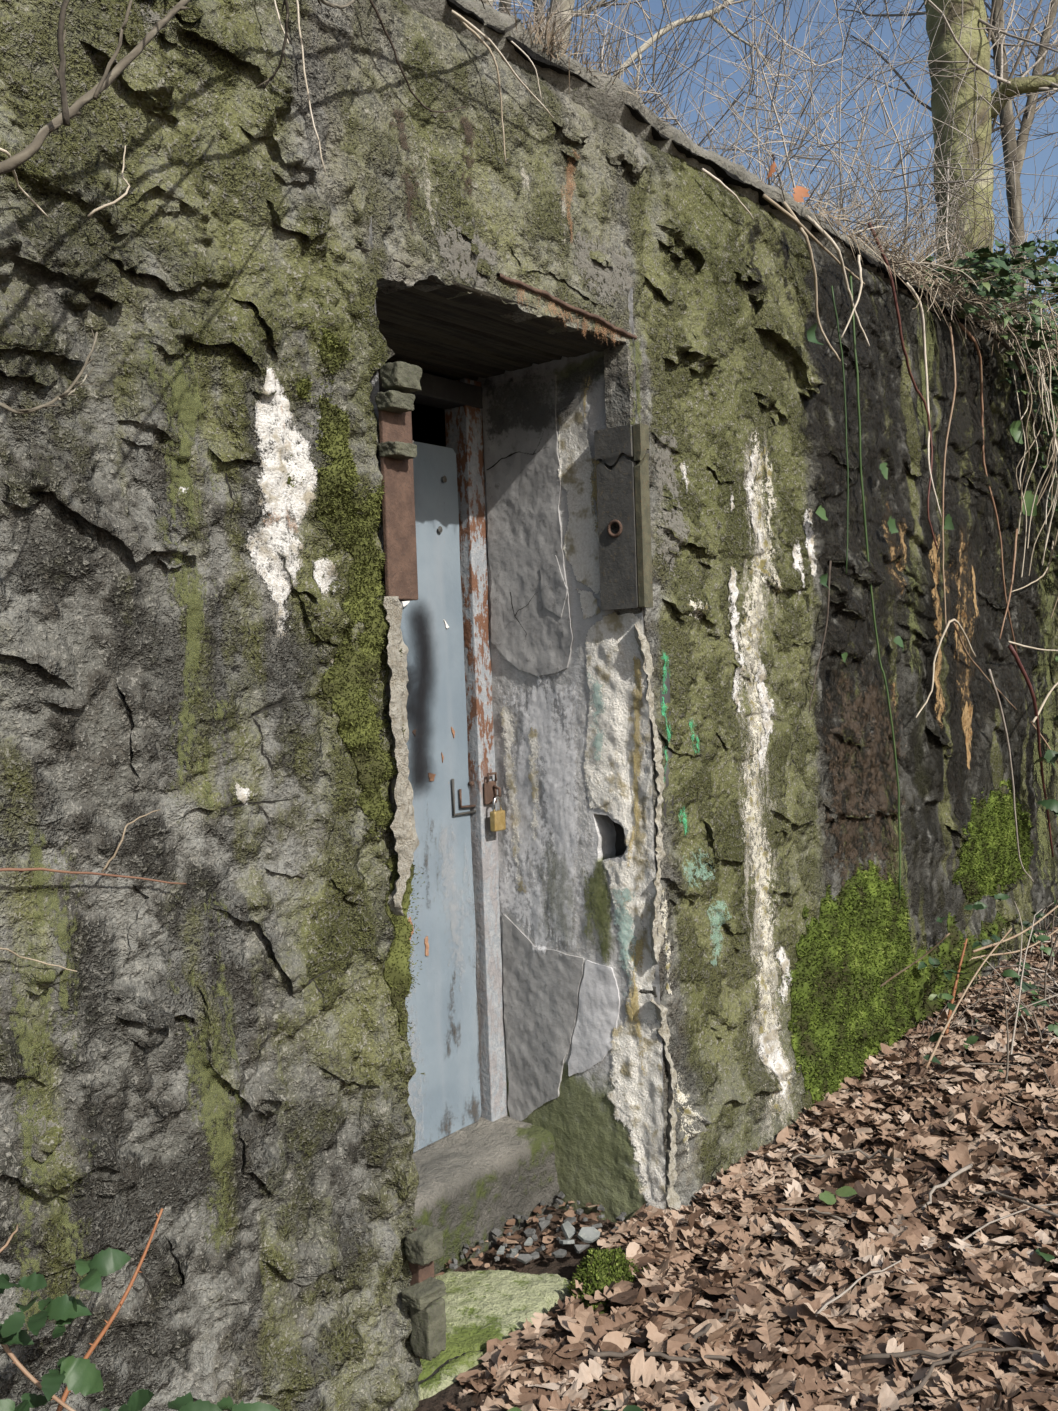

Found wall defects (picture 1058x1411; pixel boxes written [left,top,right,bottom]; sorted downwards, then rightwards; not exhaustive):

water stain [245,367,340,636]
peeling [383,631,419,853]
peeling [482,374,752,1121]
peeling [765,858,803,906]
water stain [728,213,917,1128]